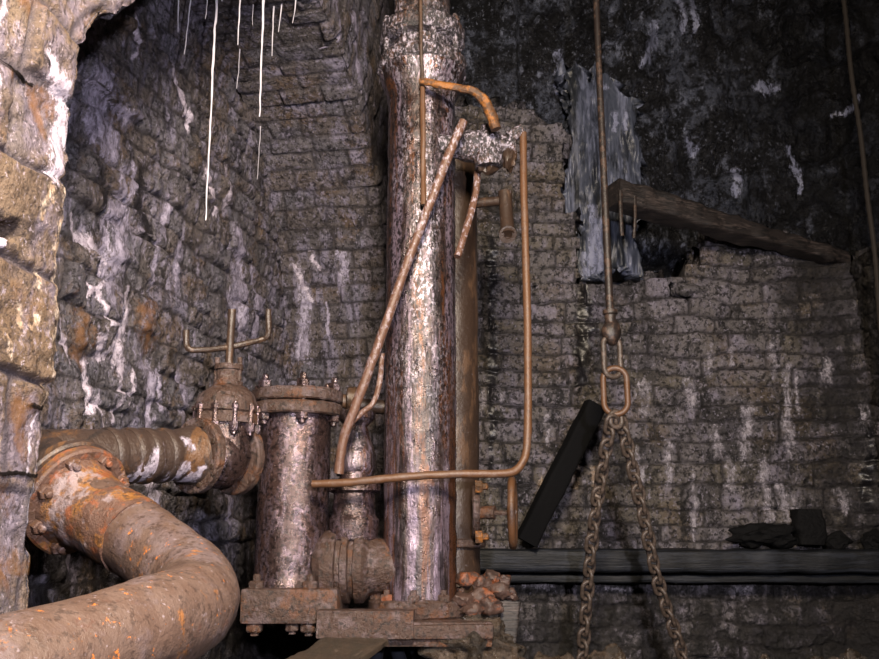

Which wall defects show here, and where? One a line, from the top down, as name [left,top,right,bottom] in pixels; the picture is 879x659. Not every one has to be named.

leakage [172,63,194,134]
leakage [203,162,233,218]
leakage [15,304,40,331]
leakage [26,48,182,473]
leakage [224,220,265,351]
leakage [289,250,322,365]
leakage [335,250,350,297]
leakage [769,342,800,456]
crack [0,470,38,479]
leakage [690,473,698,543]
leakage [712,405,755,489]
leakage [759,458,797,524]